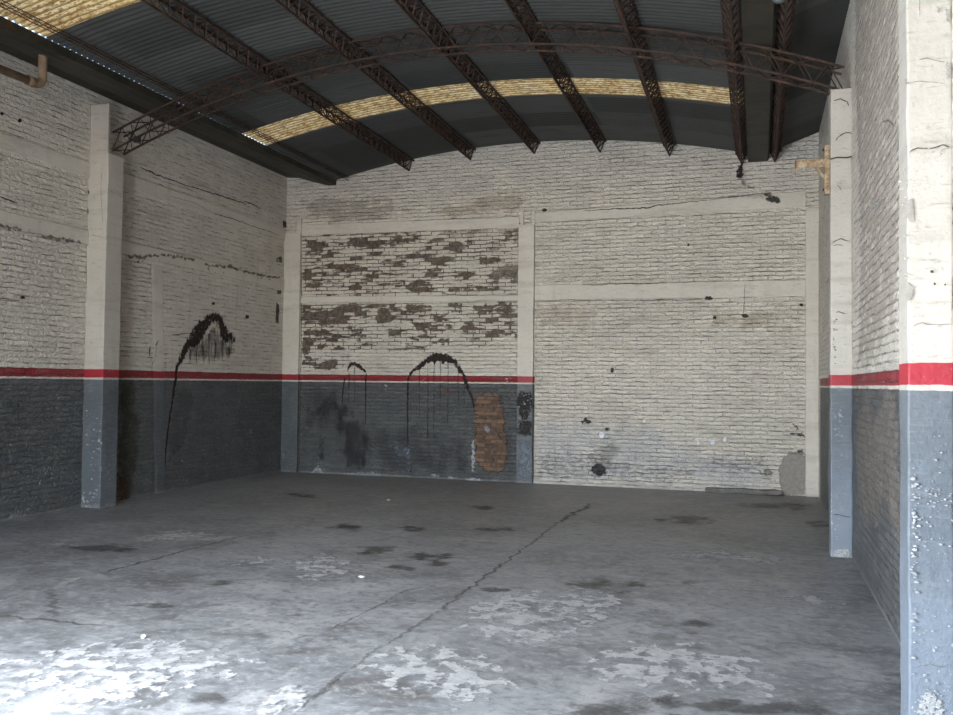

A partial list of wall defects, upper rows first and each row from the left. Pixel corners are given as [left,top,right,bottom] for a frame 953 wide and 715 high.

peeling [301,223,520,370]
leakage [165,365,179,465]
flaking render [471,391,533,480]